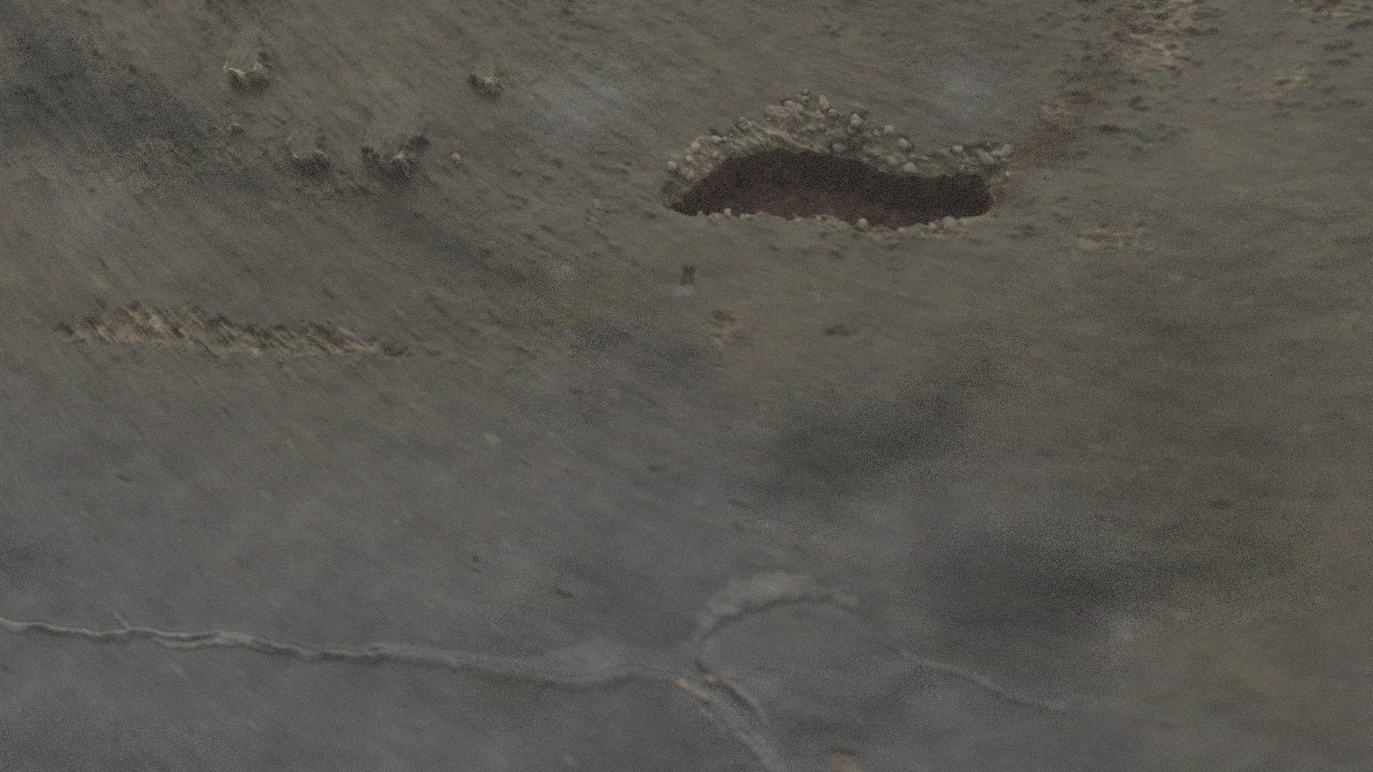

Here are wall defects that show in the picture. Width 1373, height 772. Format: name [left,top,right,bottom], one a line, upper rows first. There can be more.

peeling [223,0,273,91]
peeling [467,33,504,95]
peeling [360,77,432,180]
spalling [654,88,1019,250]
crack [0,611,793,772]